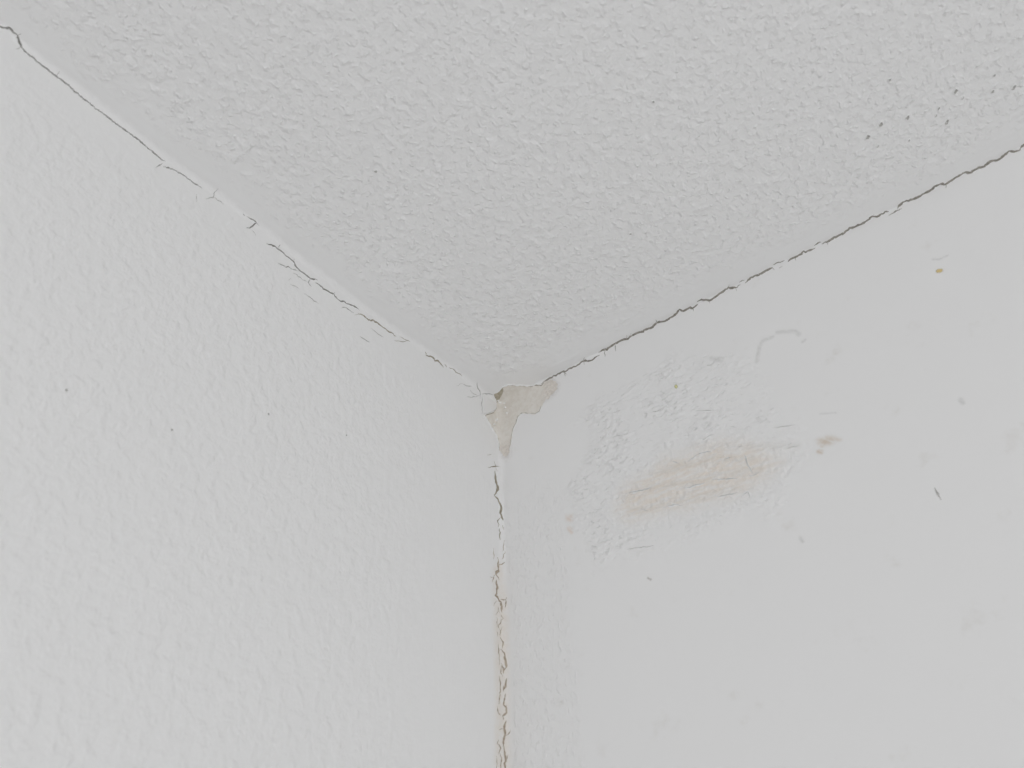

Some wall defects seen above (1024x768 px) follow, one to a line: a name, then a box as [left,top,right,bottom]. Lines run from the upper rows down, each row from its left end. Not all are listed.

crack [0,25,494,414]
peeling [482,380,558,457]
crack [541,144,1024,384]
crack [488,454,513,768]